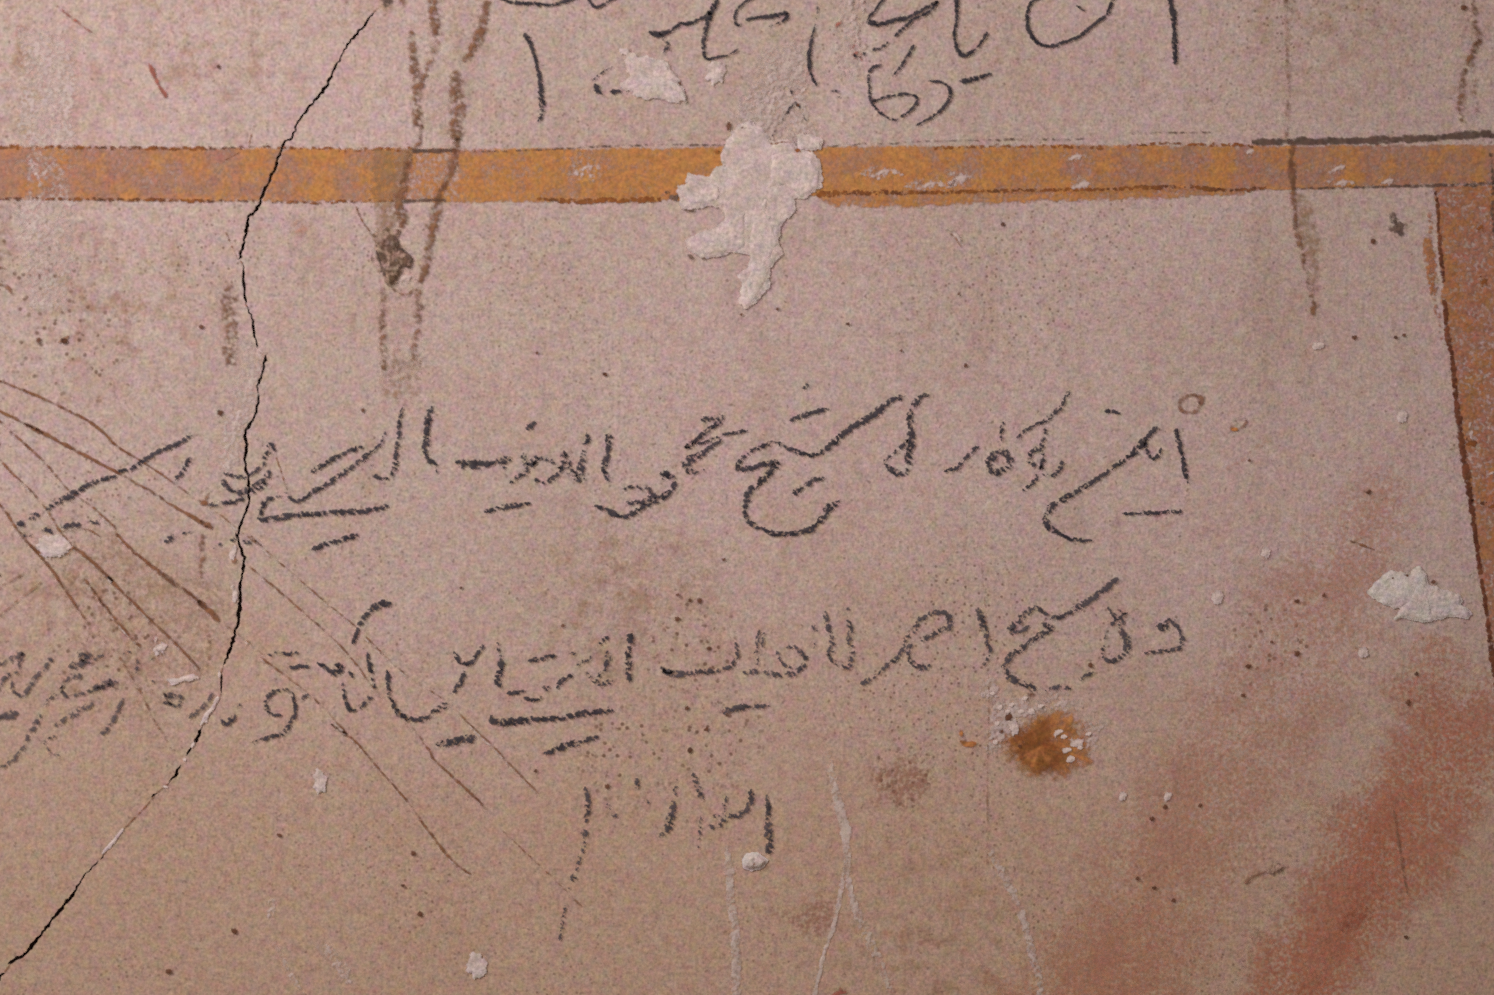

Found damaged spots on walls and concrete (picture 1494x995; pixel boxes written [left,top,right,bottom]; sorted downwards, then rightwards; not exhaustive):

damp [374,0,490,370]
spalling [619,48,687,103]
flaking render [665,45,823,316]
crack [0,0,404,980]
rust [959,678,1107,780]
flaking render [1366,566,1472,623]